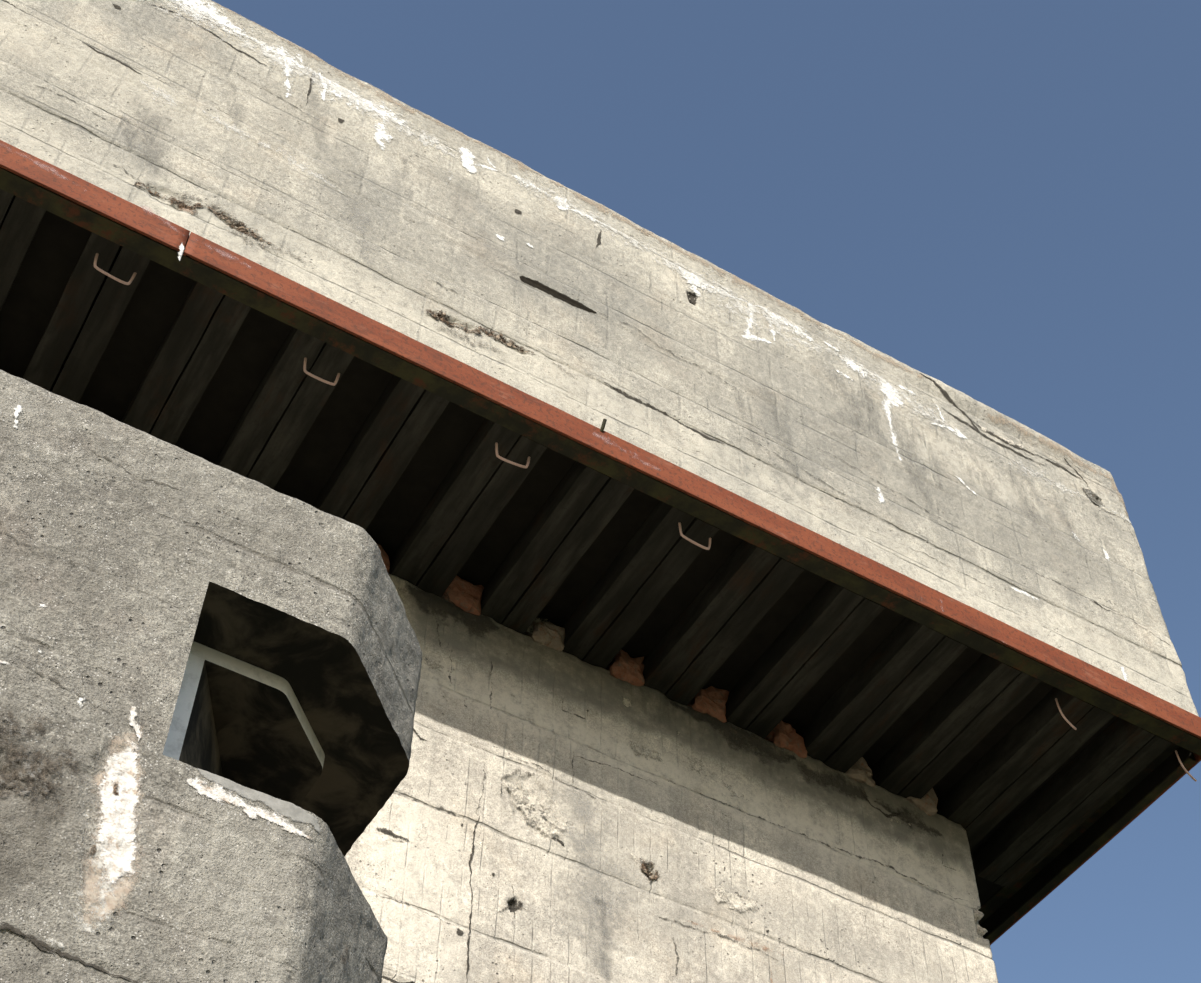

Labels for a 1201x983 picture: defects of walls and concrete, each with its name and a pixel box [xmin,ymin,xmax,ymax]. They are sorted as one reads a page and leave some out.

spalling [135,182,306,262]
spalling [520,276,597,313]
spalling [426,309,534,354]
crack [920,373,1099,481]
crack [376,752,962,981]
crack [0,922,139,983]
crack [382,974,415,983]